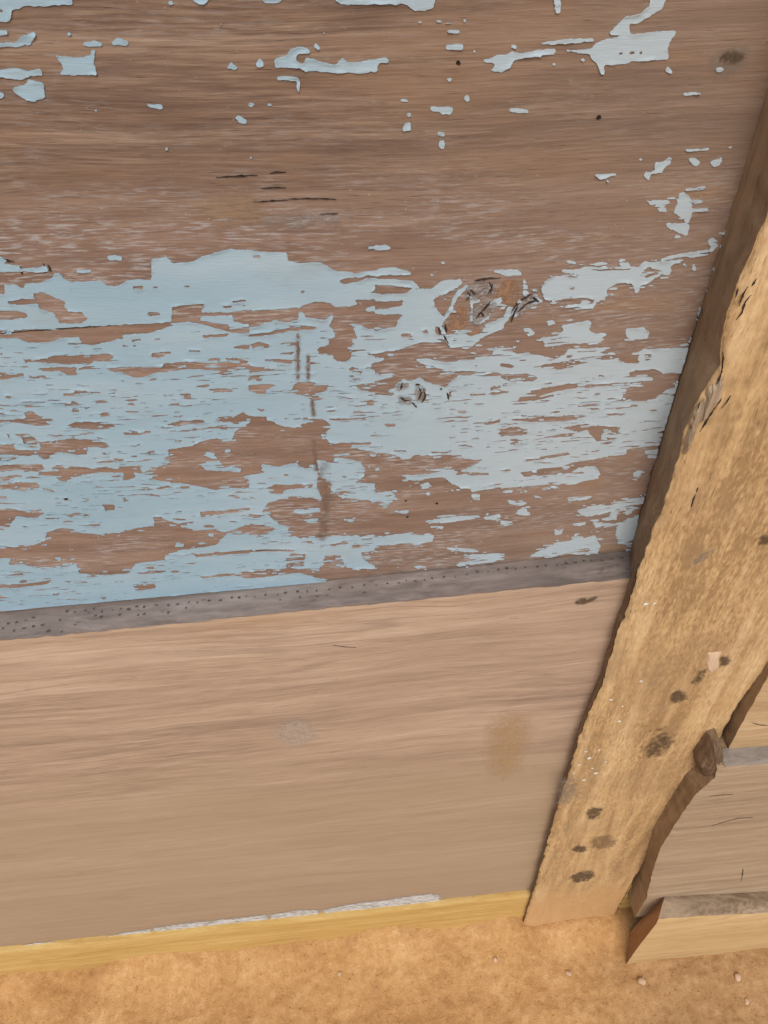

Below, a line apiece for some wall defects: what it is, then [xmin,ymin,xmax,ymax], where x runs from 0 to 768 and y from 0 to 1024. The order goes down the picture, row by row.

peeling [0,0,73,47]
peeling [56,38,128,76]
peeling [256,32,389,92]
peeling [336,0,435,23]
peeling [436,0,676,75]
peeling [0,68,45,102]
peeling [430,106,453,115]
peeling [639,157,672,180]
peeling [686,146,732,167]
peeling [647,186,709,238]
crack [466,277,539,322]
peeling [0,230,725,611]